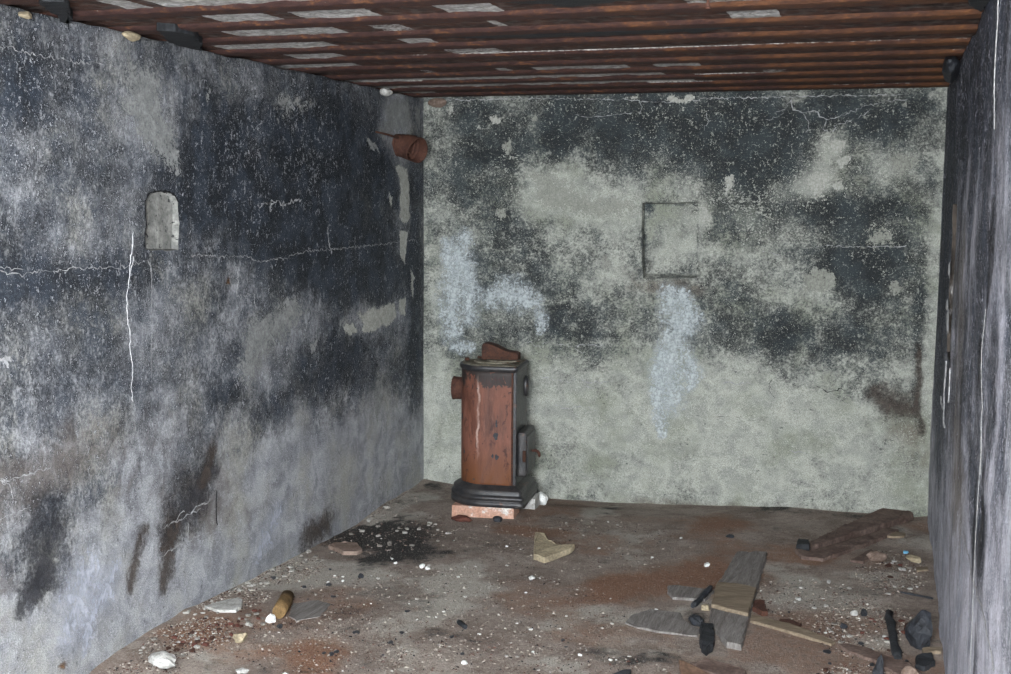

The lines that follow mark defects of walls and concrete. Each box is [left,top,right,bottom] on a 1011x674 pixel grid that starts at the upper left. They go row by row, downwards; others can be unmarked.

crack [0,190,179,401]
crack [257,199,302,209]
crack [192,238,415,310]
leakage [438,233,546,353]
leakage [986,198,997,304]
leakage [649,285,704,438]
leakage [868,347,925,436]
leakage [940,361,950,428]
crack [0,467,51,520]
leakage [15,442,218,651]
crack [160,490,218,560]
leakage [942,464,984,674]